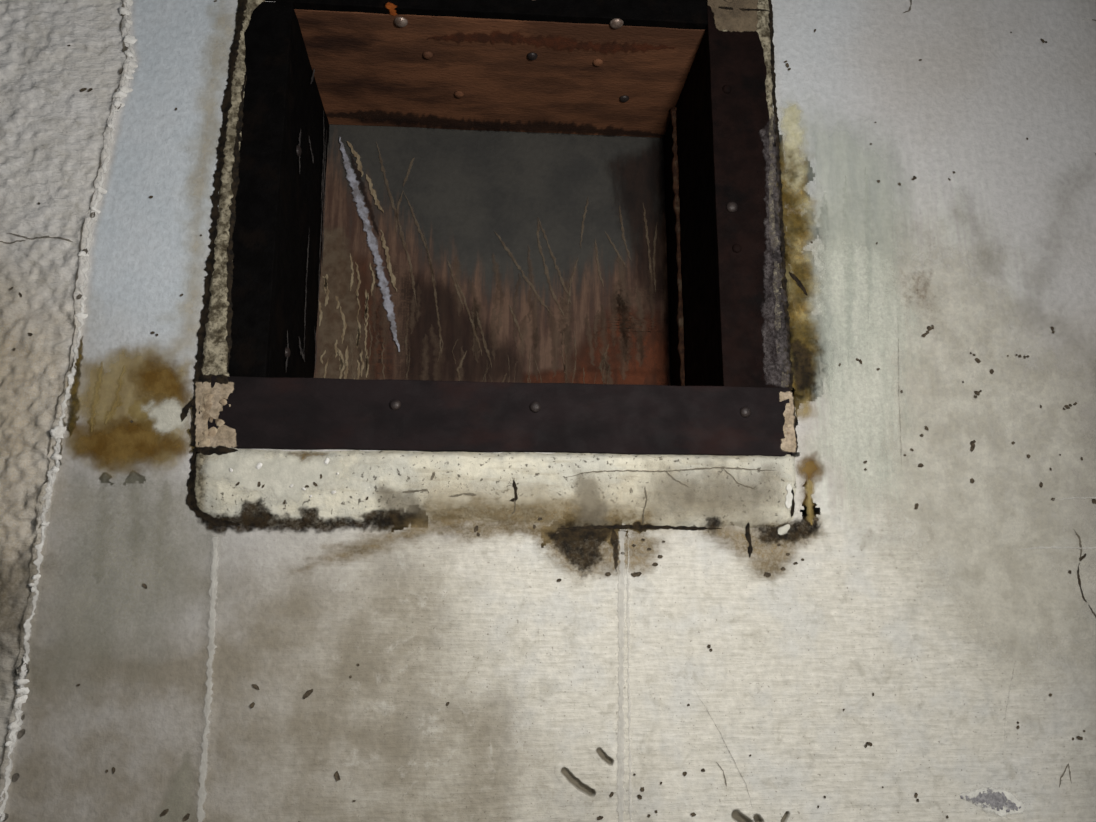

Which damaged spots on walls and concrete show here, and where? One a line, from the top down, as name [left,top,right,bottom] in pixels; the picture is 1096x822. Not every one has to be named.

peeling [195,382,373,504]
damp [199,476,665,582]
damp [660,475,820,577]
corrosion [799,457,823,525]
crack [1075,531,1096,617]
spalling [959,787,1026,817]